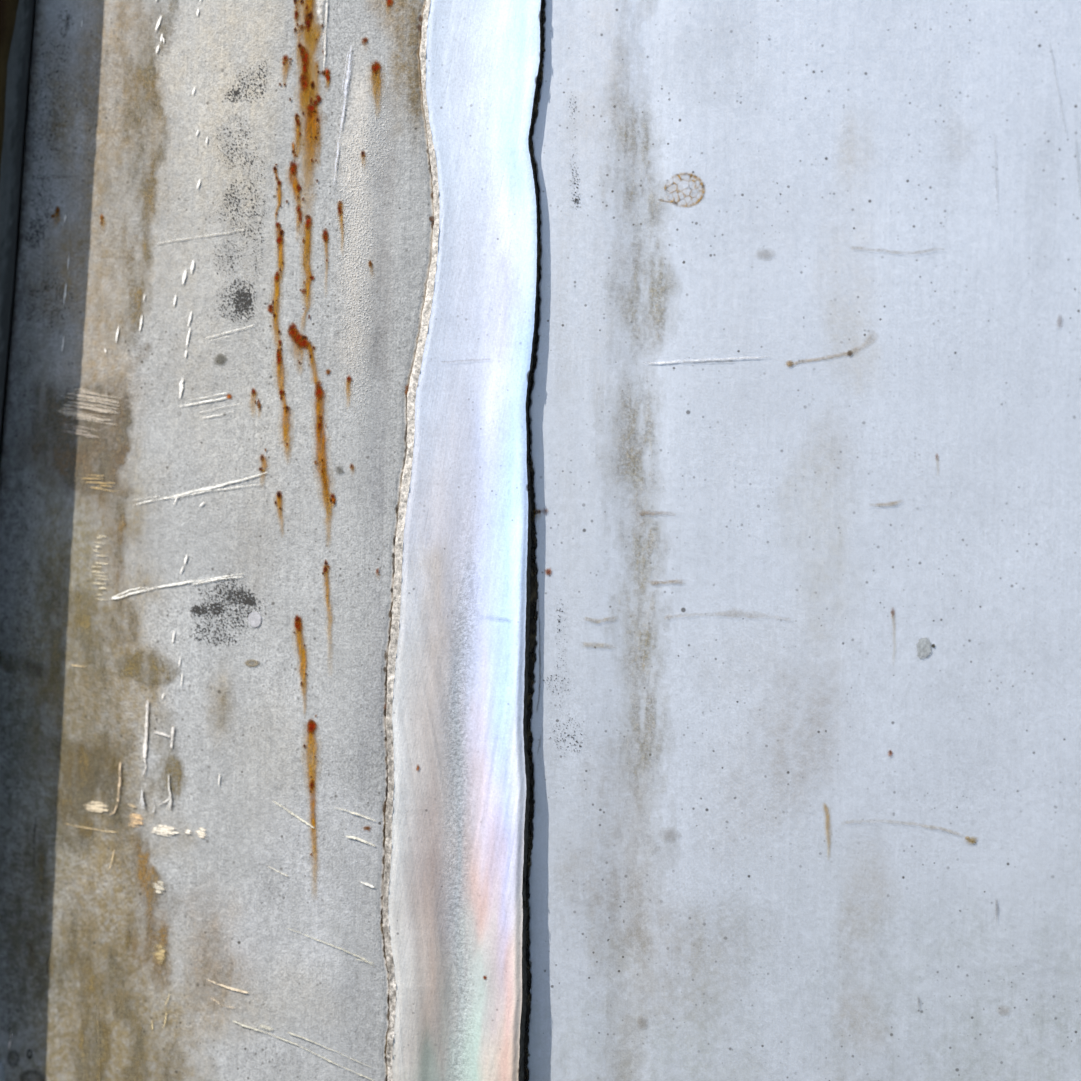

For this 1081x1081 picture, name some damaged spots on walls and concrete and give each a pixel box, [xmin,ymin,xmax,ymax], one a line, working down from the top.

water stain [651,174,704,216]
corrosion [268,0,335,517]
water stain [622,405,650,487]
corrosion [294,615,307,694]
corrosion [303,715,317,857]